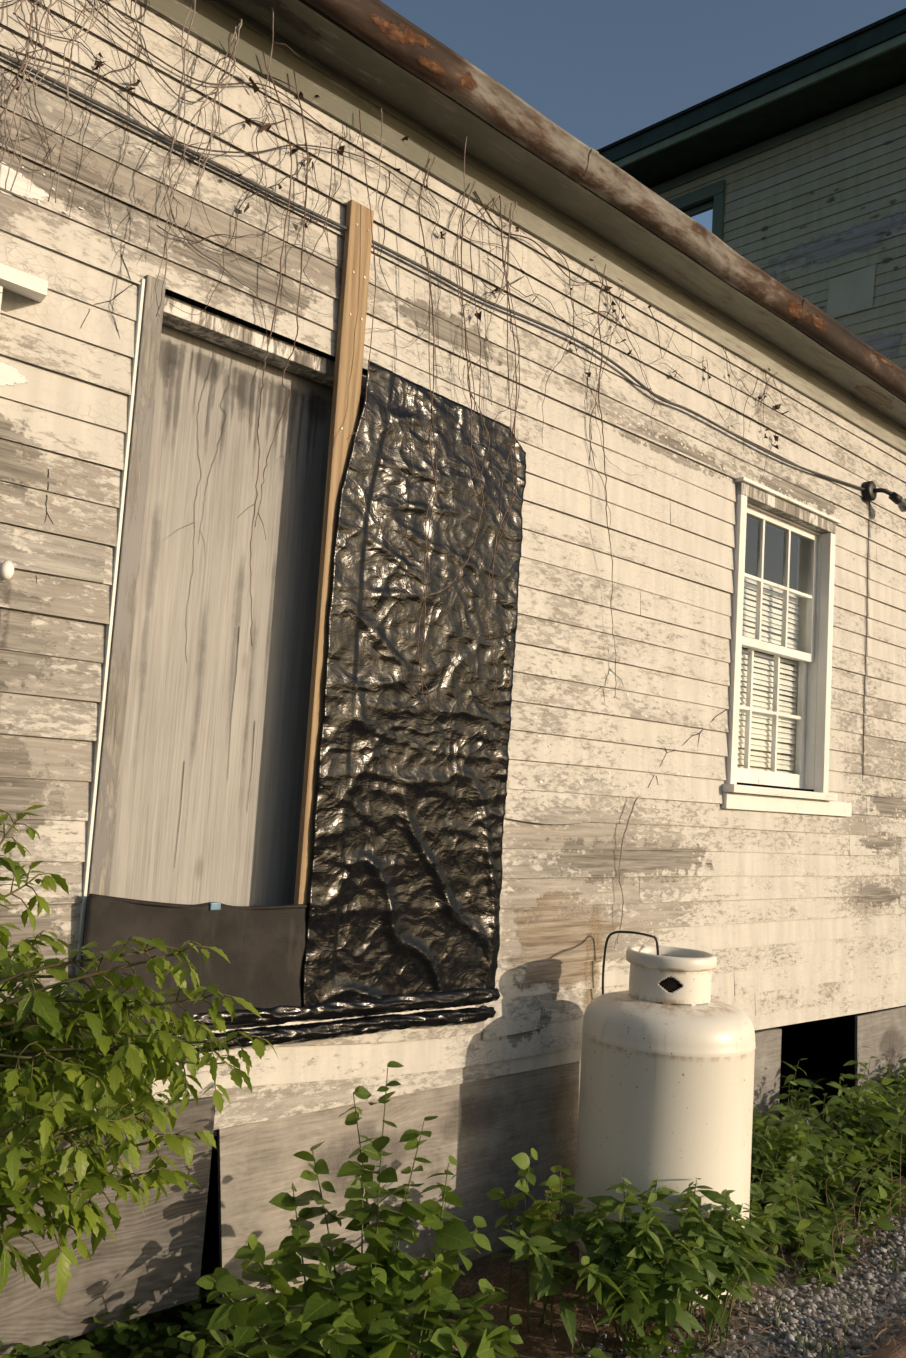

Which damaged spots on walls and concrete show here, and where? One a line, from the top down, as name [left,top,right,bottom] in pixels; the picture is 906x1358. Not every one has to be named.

corrosion [370,15,445,76]
corrosion [461,71,477,90]
peeling [0,117,151,223]
peeling [166,226,317,316]
corrosion [788,300,827,331]
peeling [0,362,29,386]
peeling [0,413,67,498]
peeling [0,586,81,696]
peeling [0,735,66,856]
peeling [849,790,906,859]
peeling [848,882,902,908]